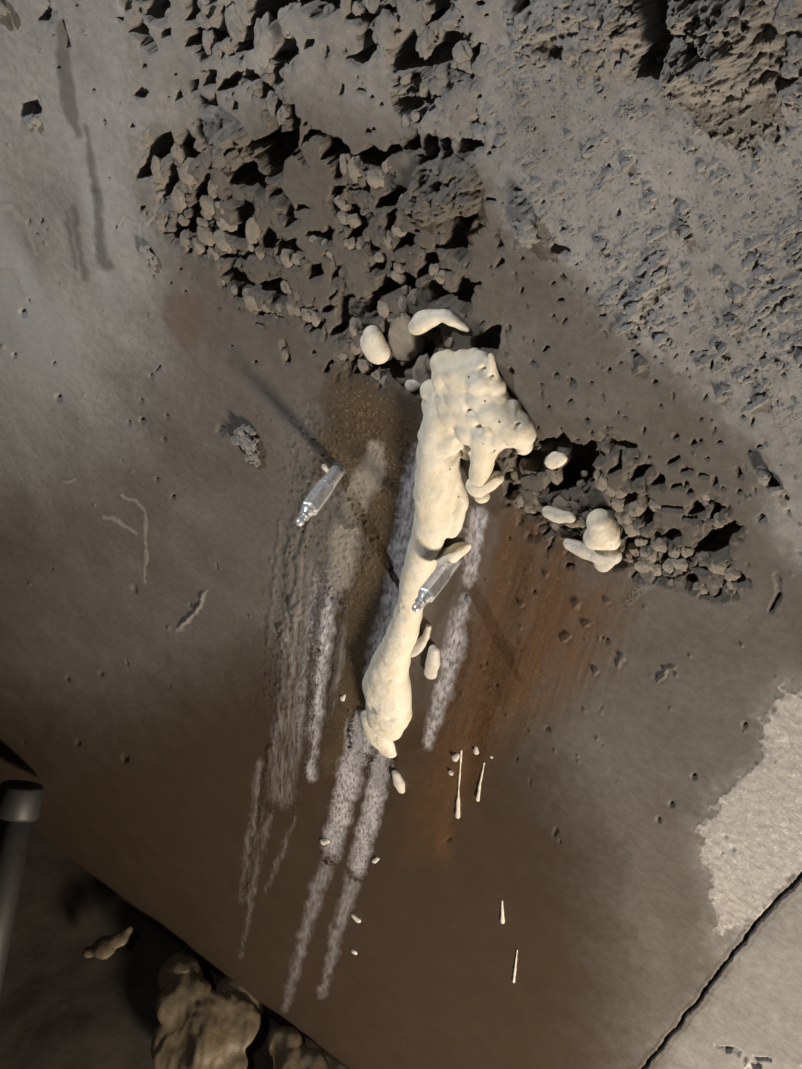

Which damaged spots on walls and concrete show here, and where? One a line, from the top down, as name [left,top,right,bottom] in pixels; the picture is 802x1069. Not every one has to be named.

corrosion [318,366,419,780]
leakage [365,455,417,673]
leakage [0,508,597,1069]
leakage [698,687,802,935]
crack [633,862,802,1069]
spalling [710,1038,779,1069]